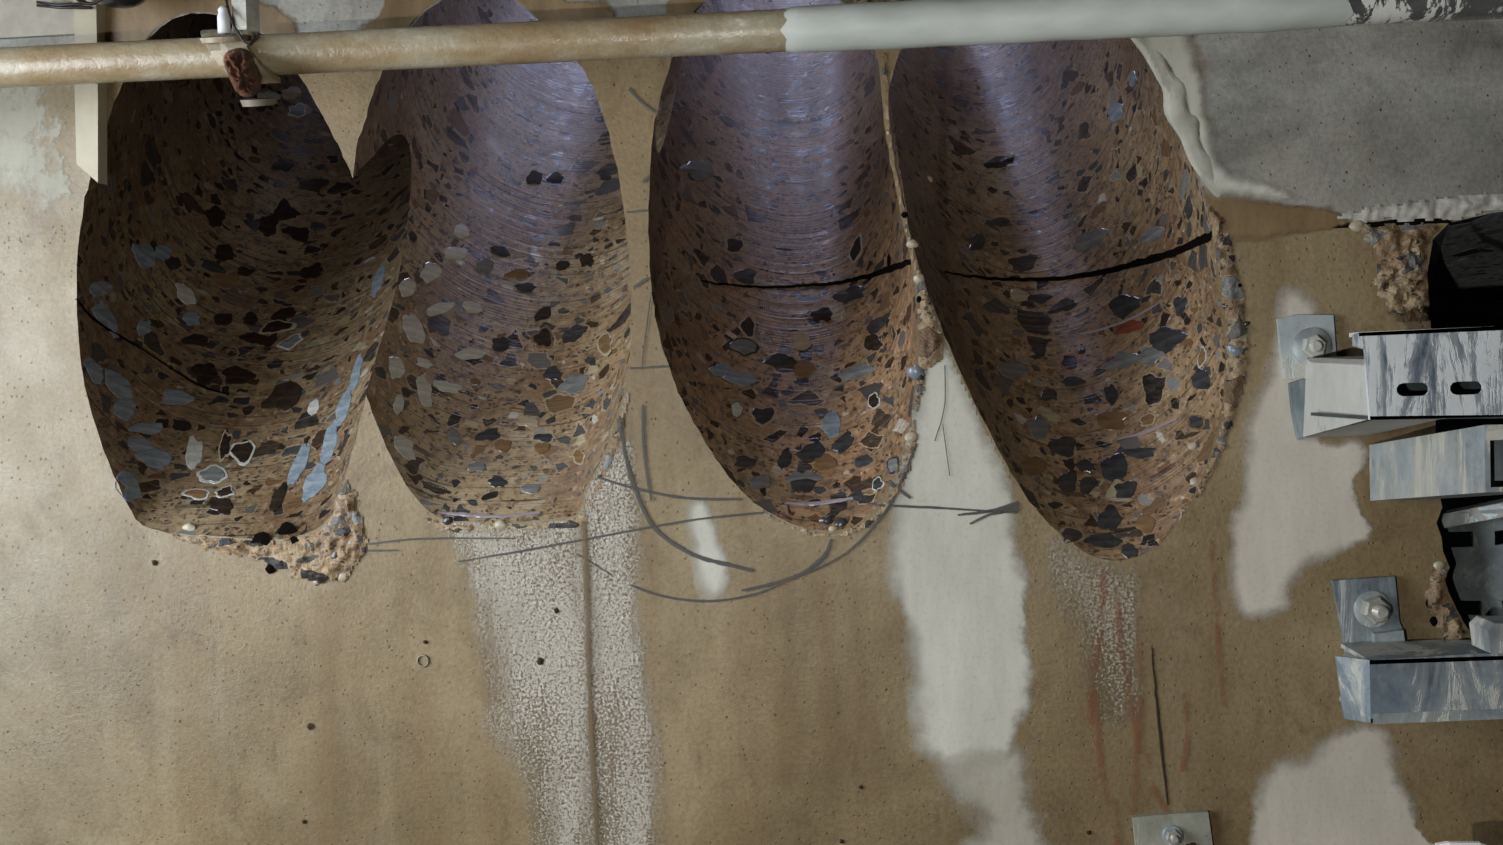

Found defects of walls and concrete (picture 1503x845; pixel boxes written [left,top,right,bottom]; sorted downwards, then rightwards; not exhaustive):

crack [701,230,1212,289]
leakage [1278,289,1315,319]
crack [1333,218,1451,228]
leakage [1232,341,1371,617]
leakage [454,443,653,845]
leakage [891,350,1043,845]
leakage [1250,726,1434,845]